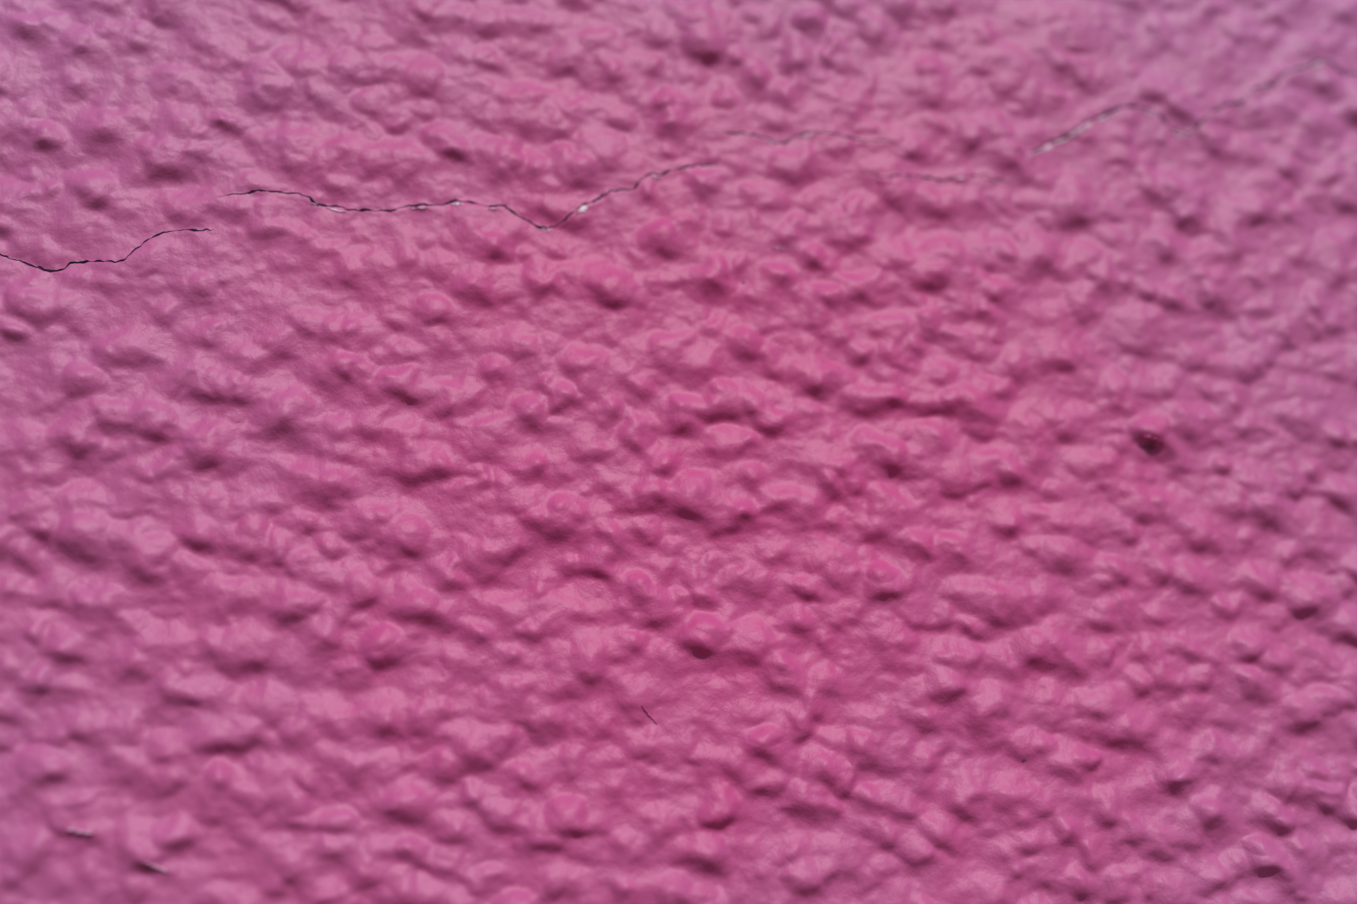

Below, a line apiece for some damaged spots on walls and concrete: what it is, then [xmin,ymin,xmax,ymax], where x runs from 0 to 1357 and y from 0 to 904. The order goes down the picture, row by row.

crack [219,59,1357,231]
crack [0,228,214,272]